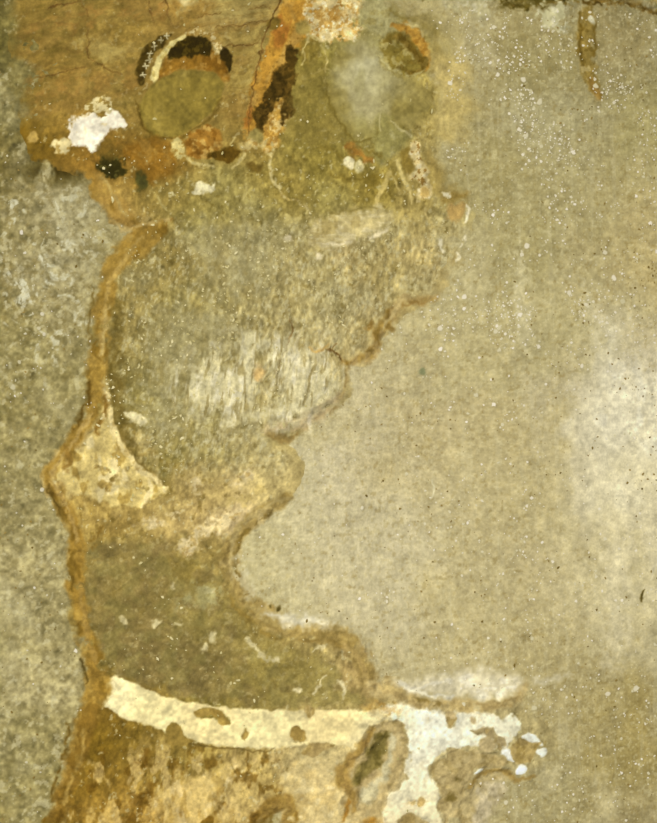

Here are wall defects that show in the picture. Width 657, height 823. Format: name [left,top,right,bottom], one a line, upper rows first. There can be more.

crack [34,0,124,79]
crack [197,0,284,137]
leakage [381,0,496,151]
corrosion [573,2,604,103]
crack [569,0,657,17]
flaking render [338,290,445,406]
flaking render [38,169,176,823]
flaking render [216,489,543,823]
flaking render [163,721,194,747]
flaking render [193,706,232,727]
flaking render [198,813,215,823]